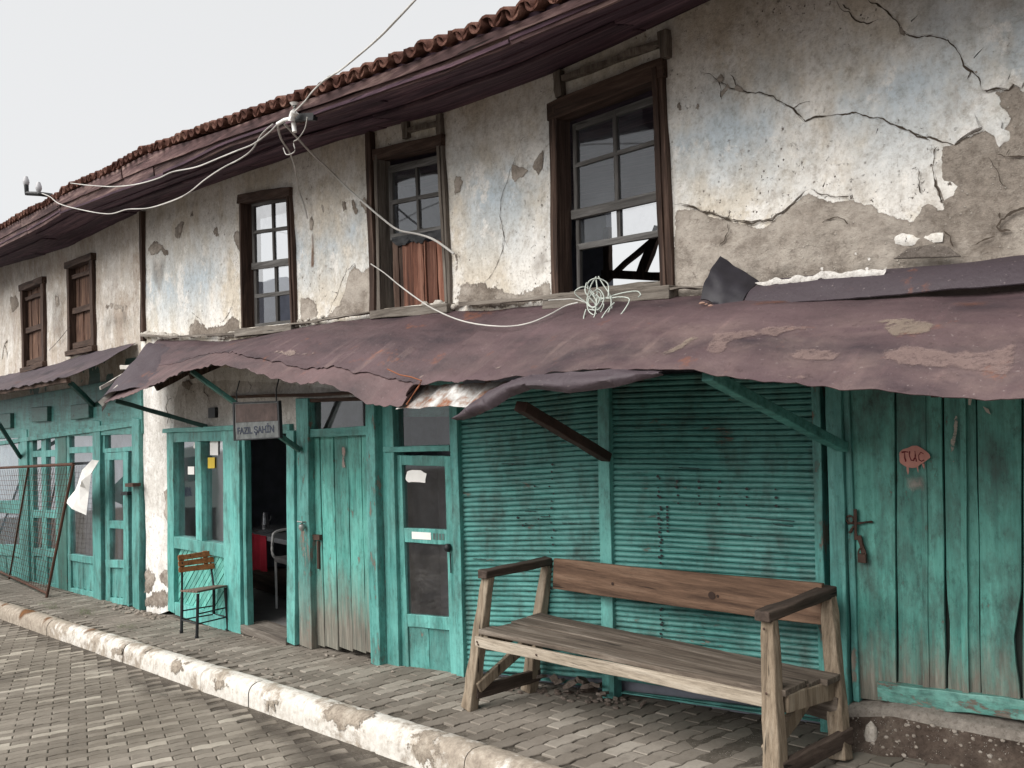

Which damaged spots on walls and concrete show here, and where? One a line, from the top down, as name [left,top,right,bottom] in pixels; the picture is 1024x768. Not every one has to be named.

crack [694,0,1014,201]
crack [484,138,544,283]
crack [674,175,852,246]
flaking render [674,67,1024,296]
crack [944,149,1024,246]
flaking render [148,241,168,256]
flaking render [300,264,369,327]
flaking render [456,281,551,309]
flaking render [189,317,239,338]
flaking render [144,566,168,609]
peeling [171,659,189,674]
peeling [323,702,381,731]